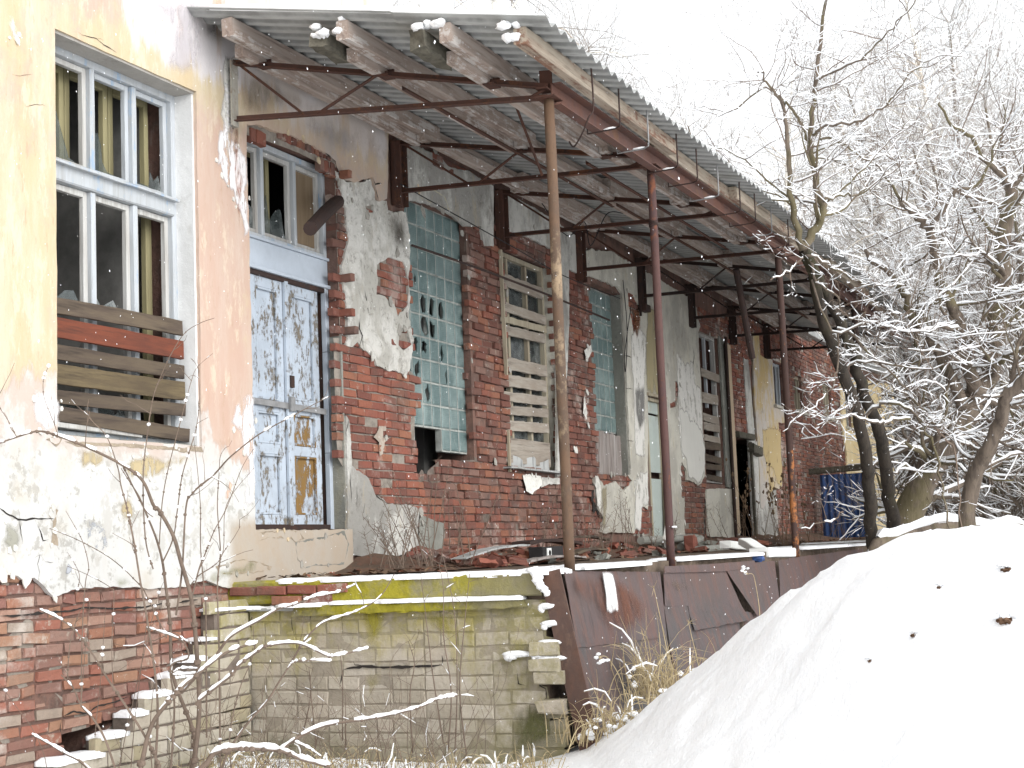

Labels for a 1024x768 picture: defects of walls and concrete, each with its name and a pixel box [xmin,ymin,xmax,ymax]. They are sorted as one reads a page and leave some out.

flaking render [215,57,652,551]
peeling [626,288,658,458]
peeling [670,354,707,538]
flaking render [696,306,846,534]
flaking render [0,567,229,768]